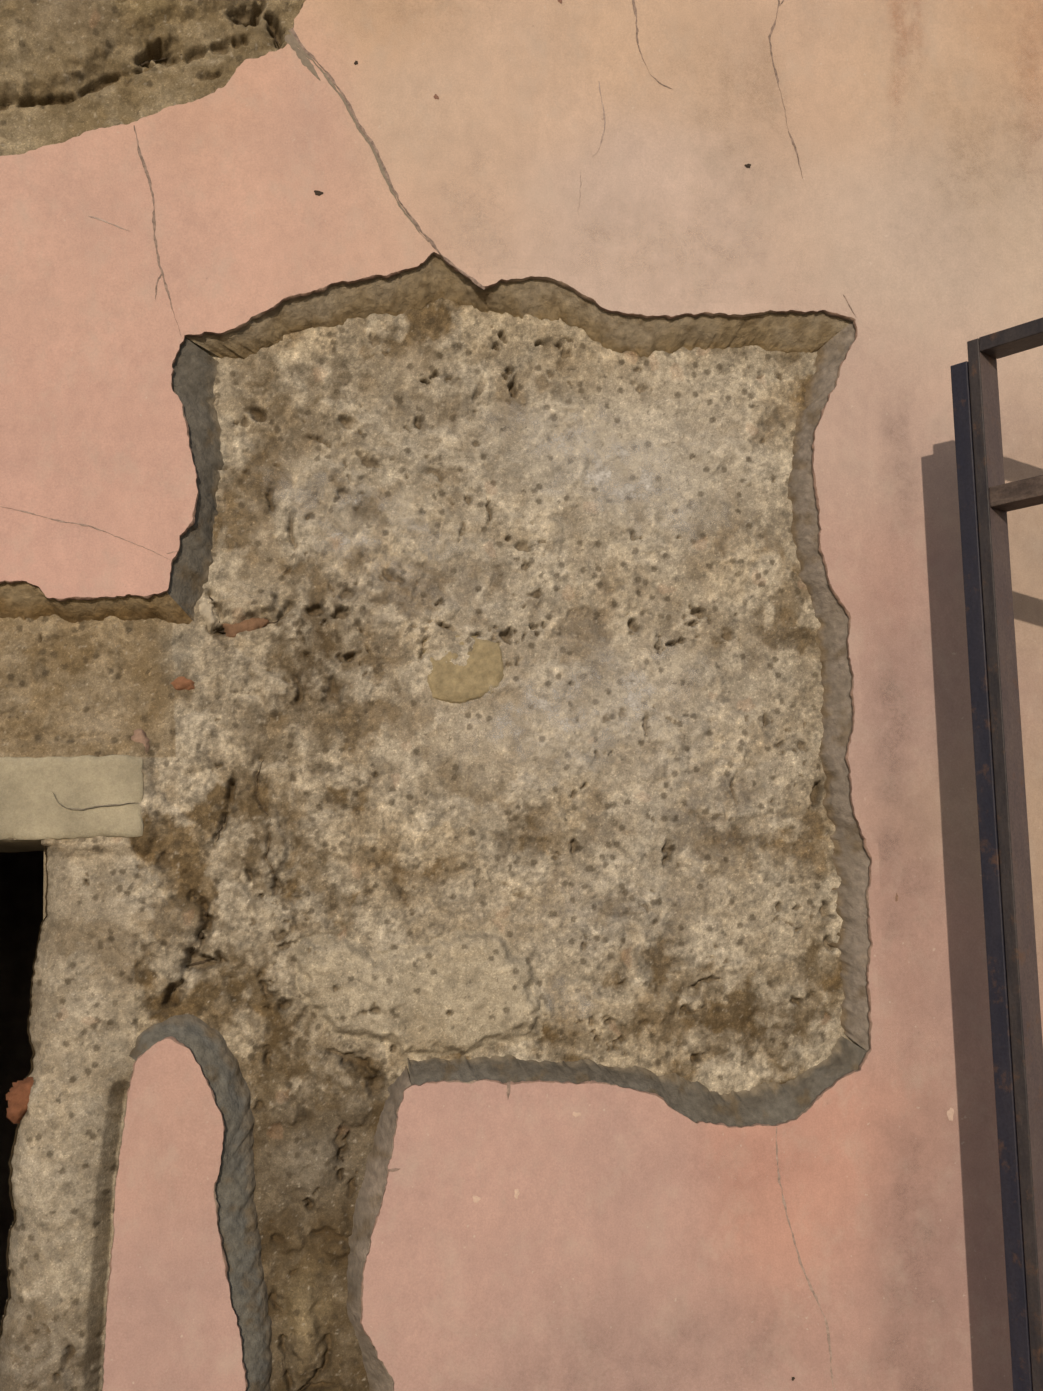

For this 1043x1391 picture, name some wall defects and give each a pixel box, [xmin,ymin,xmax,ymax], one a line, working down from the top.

crack [89,125,181,335]
flaking render [0,0,306,156]
crack [274,28,485,290]
crack [632,0,672,89]
crack [768,0,803,178]
crack [0,506,176,560]
flaking render [0,255,870,1391]
crack [776,1127,836,1391]